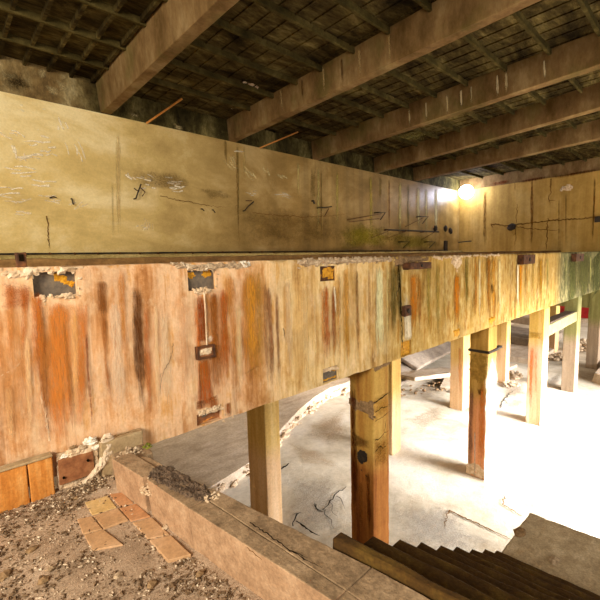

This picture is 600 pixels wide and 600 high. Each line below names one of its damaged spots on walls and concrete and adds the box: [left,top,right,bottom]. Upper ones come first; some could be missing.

crack [491,205,595,249]
spalling [0,266,83,305]
spalling [170,260,251,295]
leakage [565,252,600,301]
corrosion [243,275,262,366]
corrosion [6,288,92,423]
corrosion [195,282,235,409]
crack [374,392,390,452]
crack [250,522,322,568]
crack [292,512,320,536]
crack [314,487,346,525]